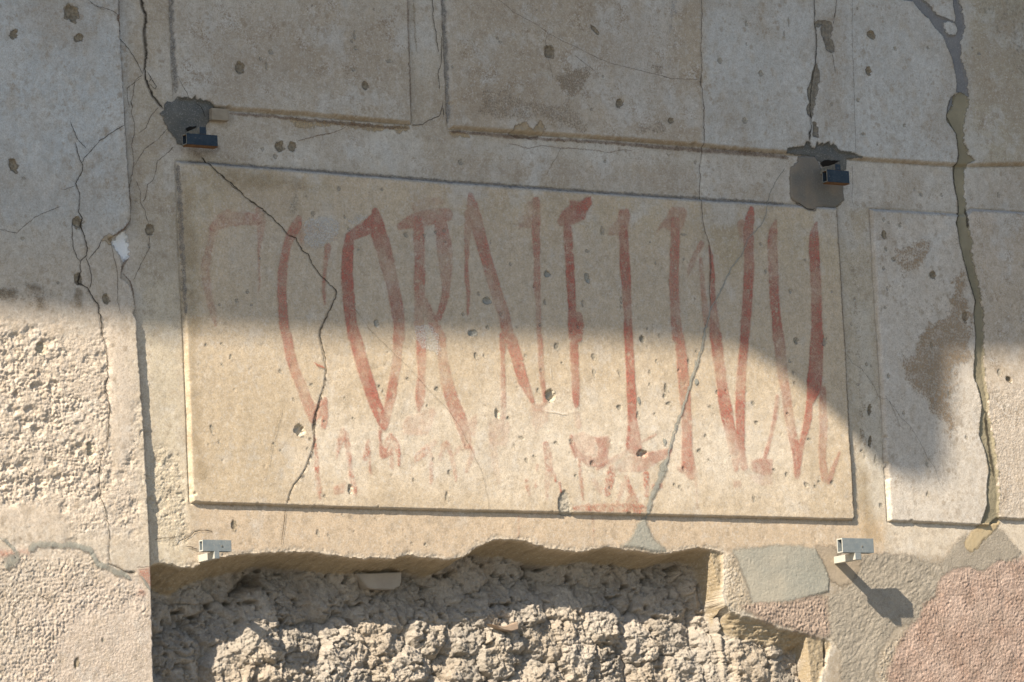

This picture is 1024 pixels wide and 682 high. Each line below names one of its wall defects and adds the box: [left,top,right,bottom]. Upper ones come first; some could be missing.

crack [8,0,206,574]
peeling [102,231,130,261]
crack [202,158,337,544]
crack [645,0,785,518]
crack [809,0,853,140]
water stain [903,272,973,434]
crack [909,0,1001,524]
spalling [742,596,830,636]